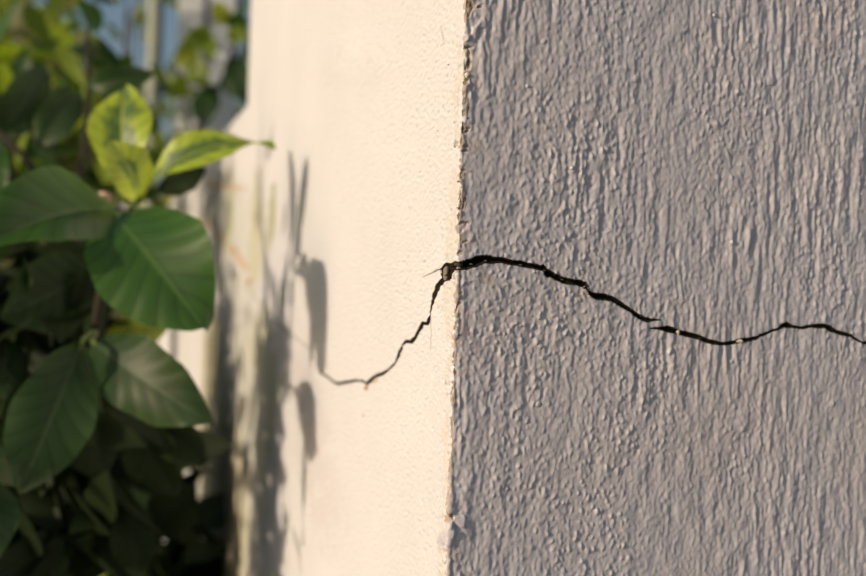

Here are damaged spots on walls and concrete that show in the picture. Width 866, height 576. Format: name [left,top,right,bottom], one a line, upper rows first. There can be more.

crack [245,255,866,385]